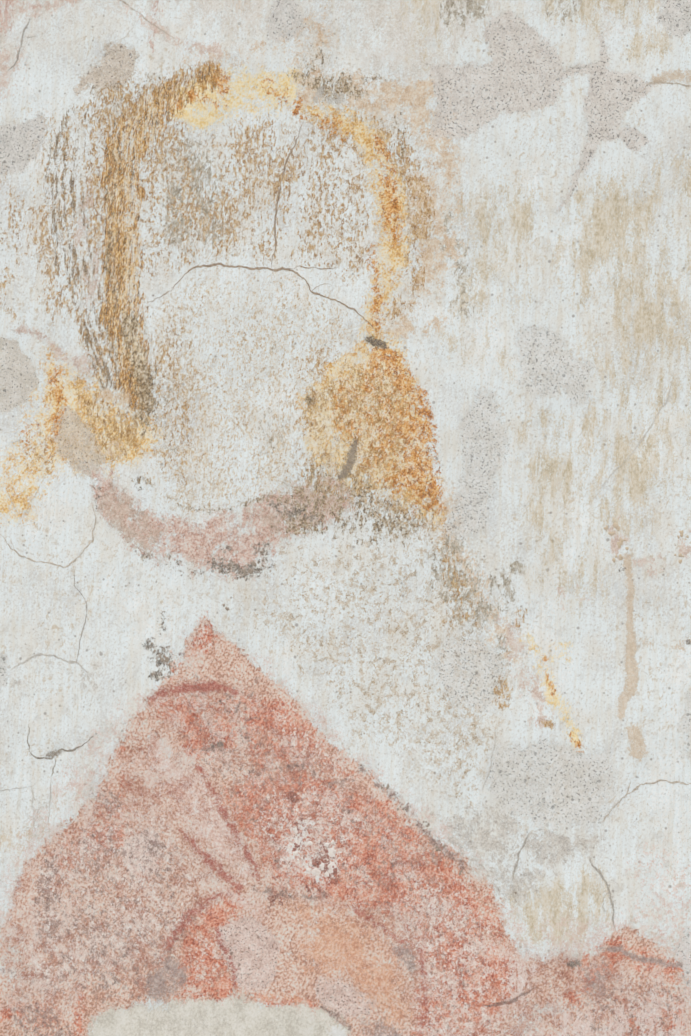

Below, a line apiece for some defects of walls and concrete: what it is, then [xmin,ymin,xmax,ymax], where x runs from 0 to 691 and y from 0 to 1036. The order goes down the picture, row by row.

crack [146,123,377,331]
crack [2,501,96,685]
crack [602,779,691,822]
crack [511,832,530,882]
crack [589,857,615,928]
peeling [83,985,351,1036]